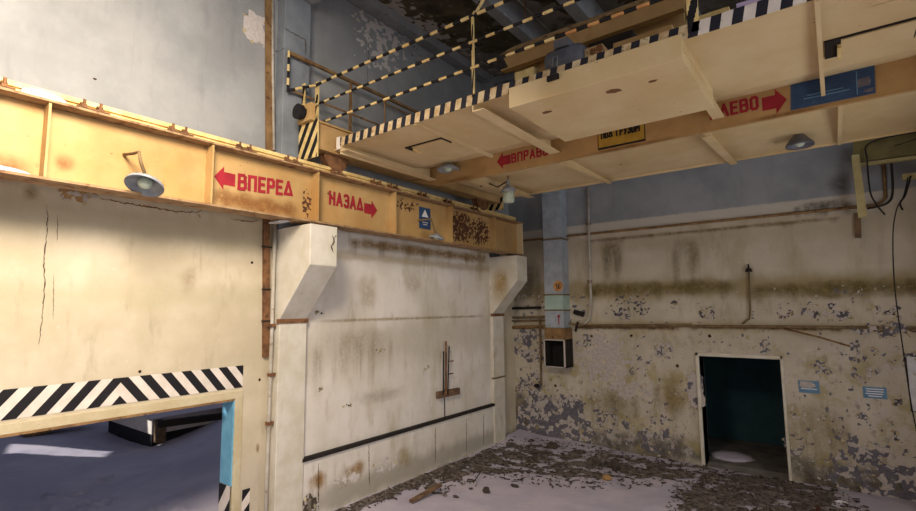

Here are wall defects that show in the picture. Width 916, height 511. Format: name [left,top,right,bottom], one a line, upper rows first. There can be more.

peeling [242,9,265,47]
peeling [352,10,443,83]
rust [354,209,490,261]
crack [38,206,58,344]
water stain [592,282,726,294]
water stain [765,282,916,295]
peeling [514,293,706,457]
peeling [689,284,916,501]